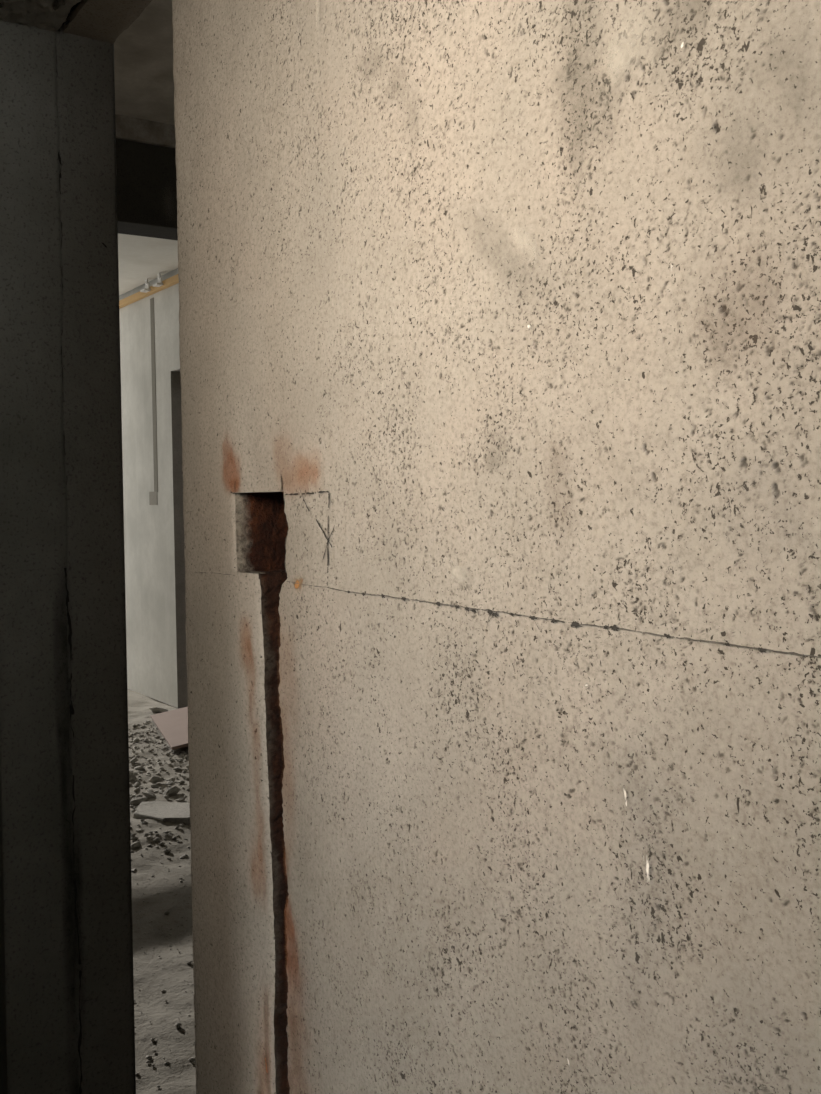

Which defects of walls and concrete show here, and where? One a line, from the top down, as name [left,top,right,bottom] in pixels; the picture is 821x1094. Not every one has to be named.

crack [64,568,74,738]